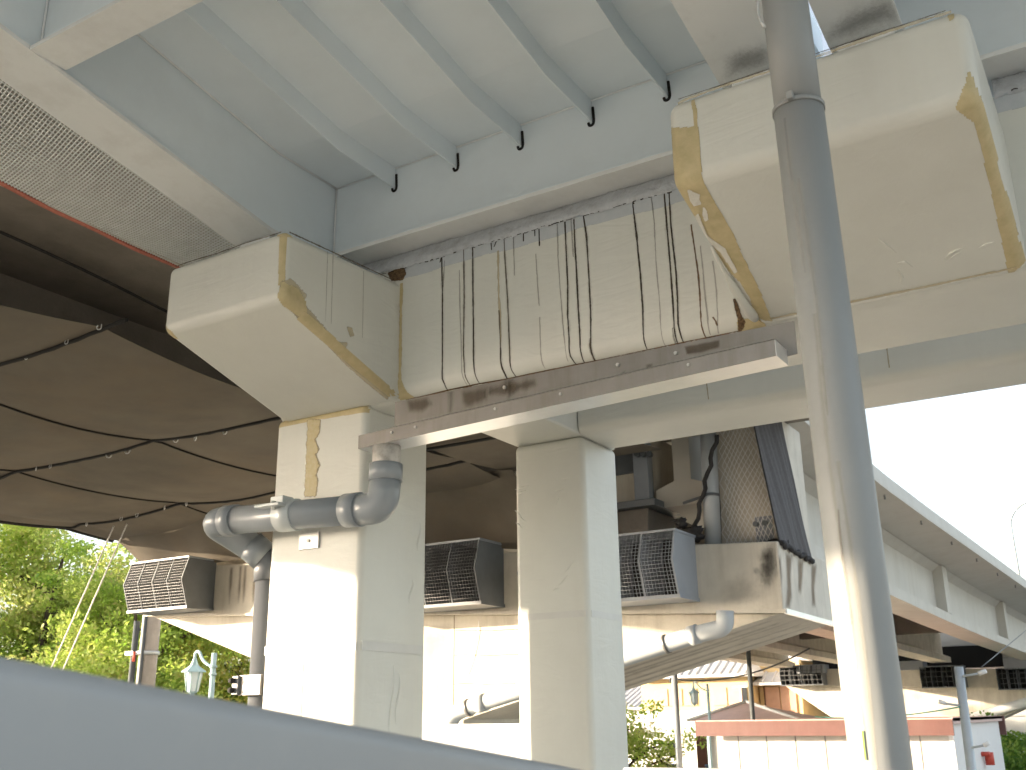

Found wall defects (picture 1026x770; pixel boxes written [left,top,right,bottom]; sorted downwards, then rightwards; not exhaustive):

peeling [815,10,955,57]
corrosion [388,268,406,281]
leakage [439,257,447,389]
leakage [463,247,478,385]
peeling [171,69,797,400]
leakage [491,241,515,379]
leakage [564,216,595,364]
leakage [632,202,647,349]
leakage [664,193,683,343]
leakage [690,224,718,337]
peeling [850,72,1026,303]
peeling [279,406,370,497]